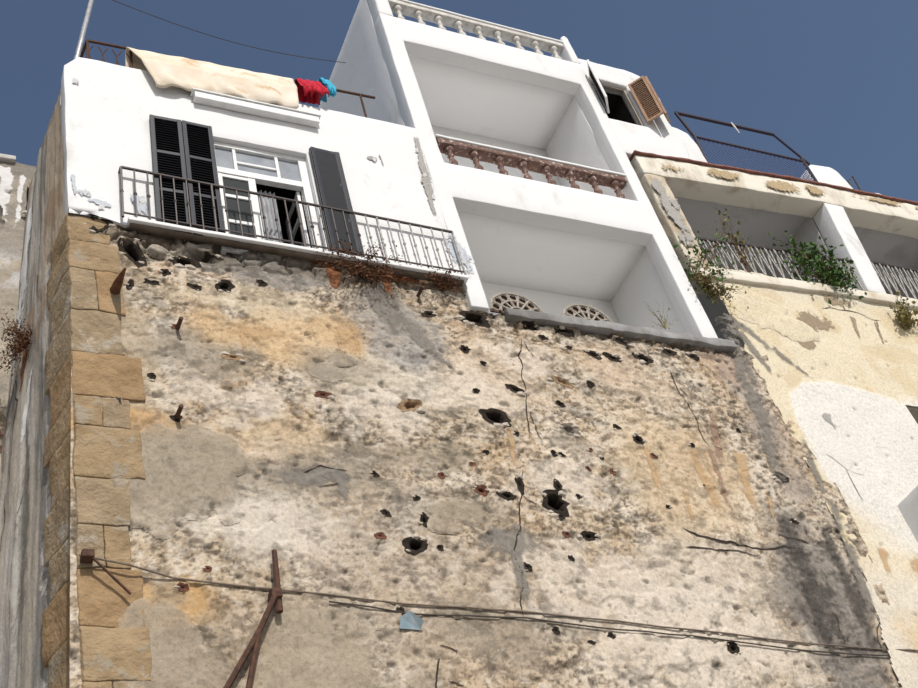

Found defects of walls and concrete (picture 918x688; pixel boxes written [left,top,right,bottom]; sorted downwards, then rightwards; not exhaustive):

peeling [0,166,33,330]
peeling [20,369,32,443]
crack [518,338,542,440]
crack [514,472,537,609]